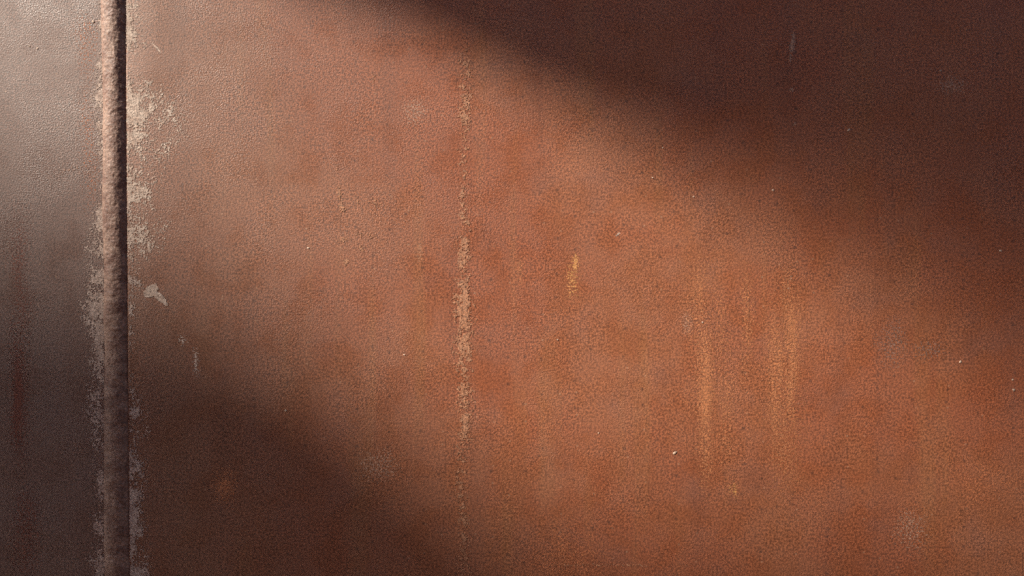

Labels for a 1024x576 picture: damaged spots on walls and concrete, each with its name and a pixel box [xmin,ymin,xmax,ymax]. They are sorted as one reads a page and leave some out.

leakage [126,70,189,353]
leakage [129,374,155,576]
corrosion [676,228,813,530]